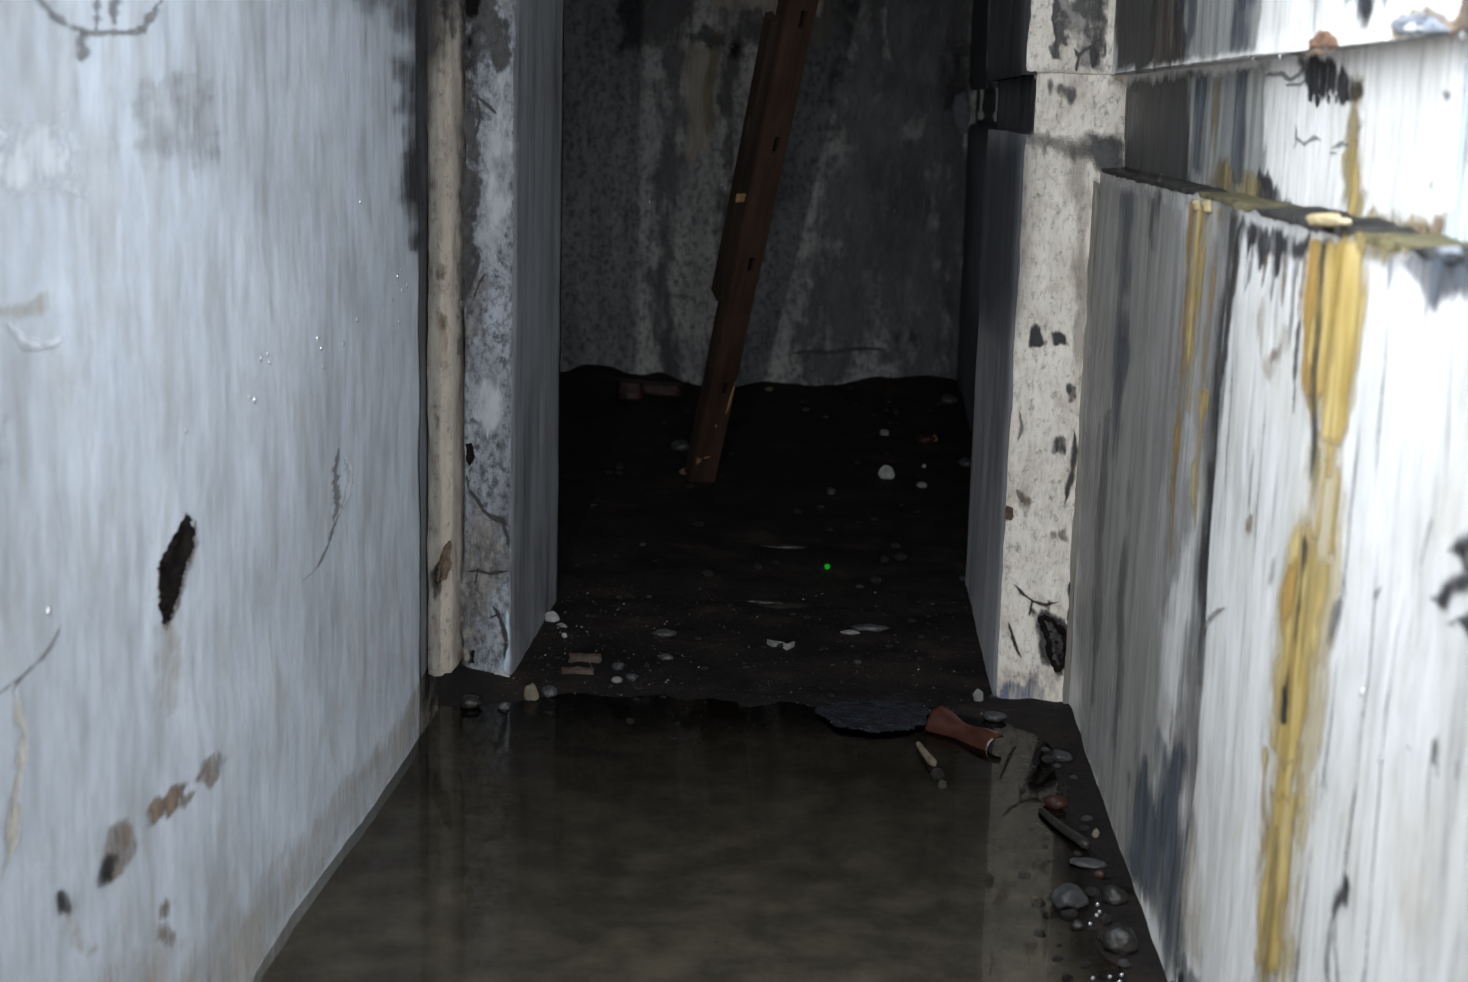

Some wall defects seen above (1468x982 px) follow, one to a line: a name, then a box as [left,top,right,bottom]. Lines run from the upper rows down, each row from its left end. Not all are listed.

crack [40,0,162,62]
crack [1051,0,1468,75]
leakage [1384,0,1462,39]
spalling [1451,0,1468,38]
leakage [1305,213,1351,227]
leakage [1387,49,1468,331]
corrosion [1163,200,1220,598]
leakage [1076,0,1265,982]
corrosion [1256,82,1448,982]